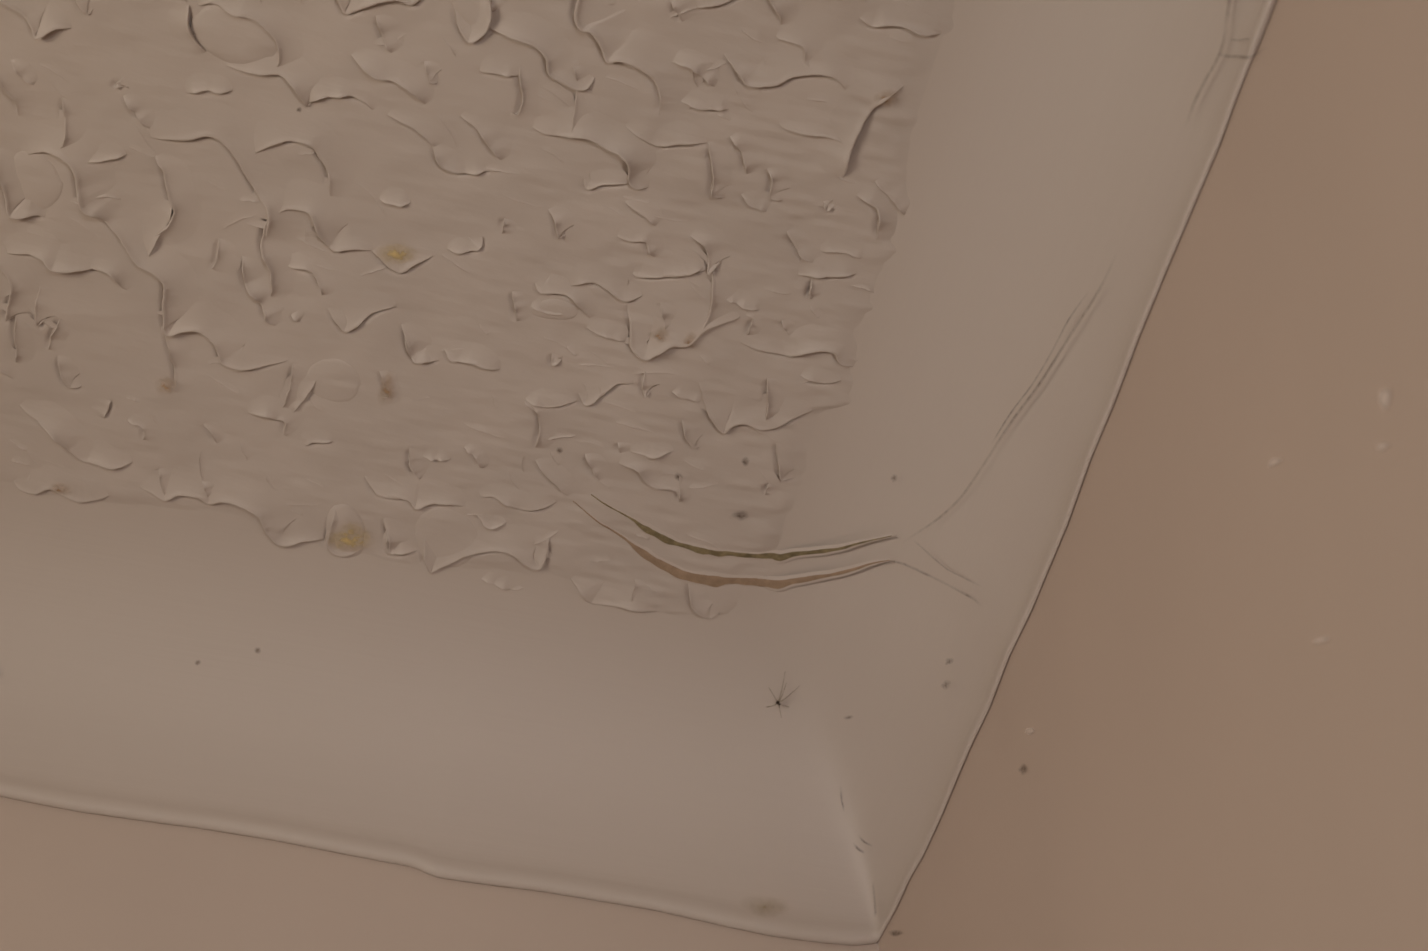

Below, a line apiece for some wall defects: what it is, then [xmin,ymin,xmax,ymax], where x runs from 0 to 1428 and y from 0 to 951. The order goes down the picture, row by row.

crack [572,494,892,592]